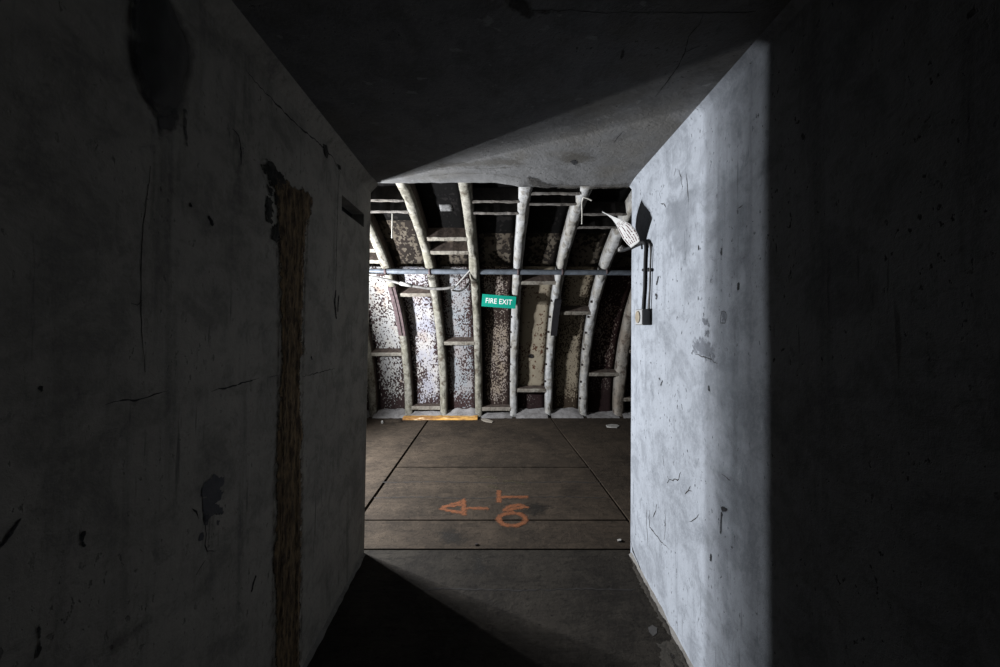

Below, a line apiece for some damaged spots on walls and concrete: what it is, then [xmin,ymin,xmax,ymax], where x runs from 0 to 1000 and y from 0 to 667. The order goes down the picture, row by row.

rust [272,178,313,667]